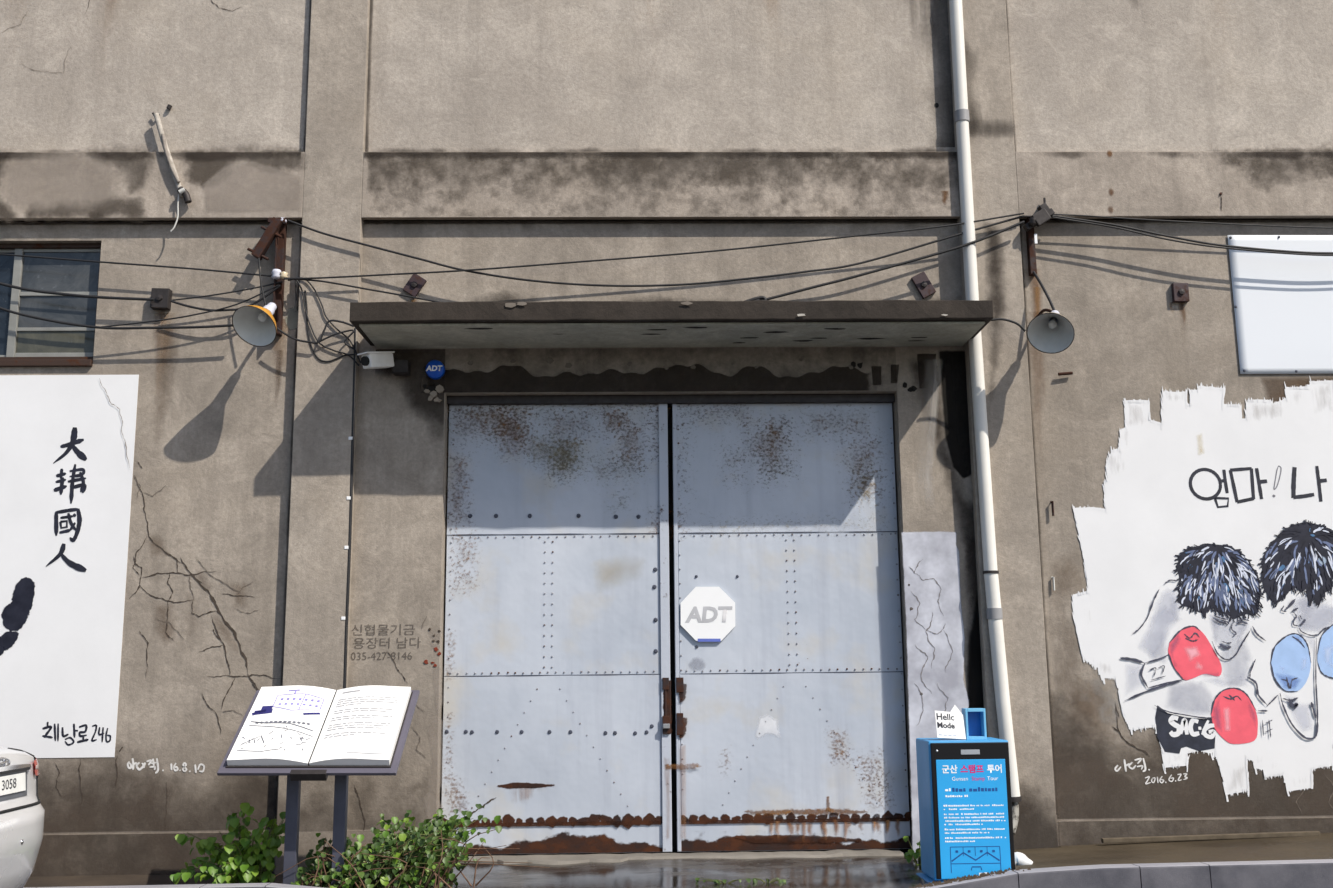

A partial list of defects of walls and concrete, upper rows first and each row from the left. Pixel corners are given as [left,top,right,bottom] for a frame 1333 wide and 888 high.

spalling [734,328,846,343]
peeling [423,337,936,402]
rust [459,404,659,469]
crack [99,378,280,729]
rust [442,778,912,854]